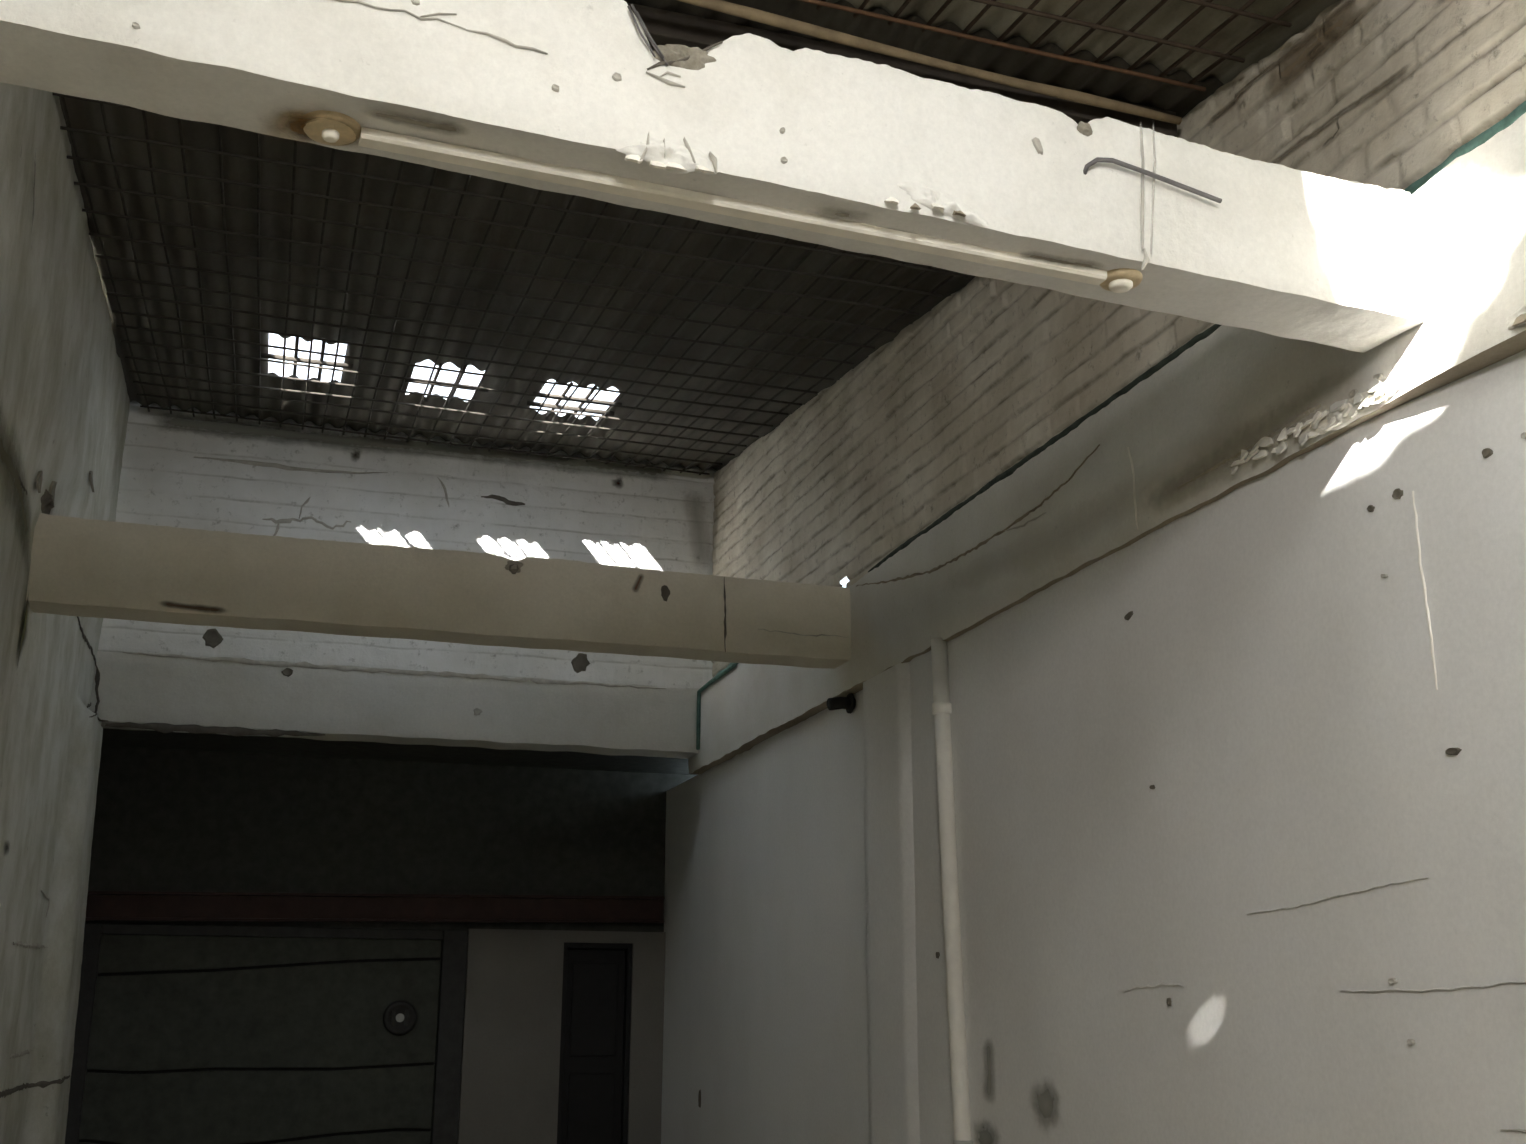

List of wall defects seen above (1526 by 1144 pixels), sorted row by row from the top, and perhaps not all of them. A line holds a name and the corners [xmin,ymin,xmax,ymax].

crack [335,0,548,55]
spalling [627,4,723,88]
flaking render [617,133,719,174]
flaking render [884,181,988,227]
spalling [1506,304,1526,330]
spalling [1231,374,1409,475]
crack [194,457,388,536]
crack [77,616,666,722]
crack [1247,878,1425,915]